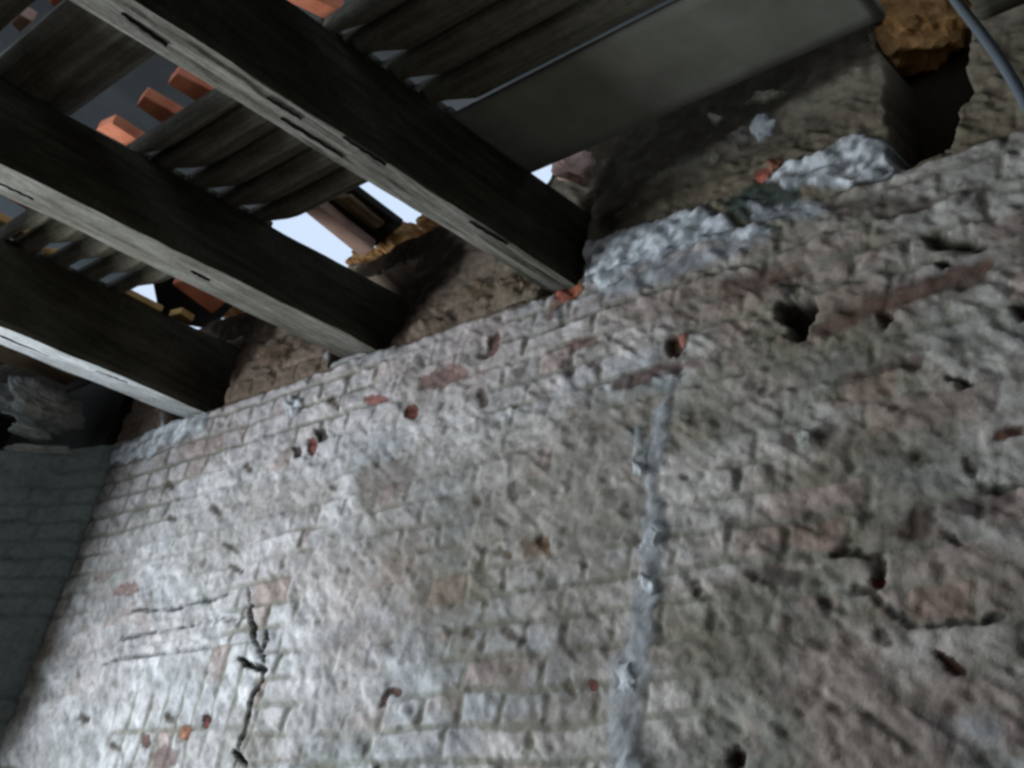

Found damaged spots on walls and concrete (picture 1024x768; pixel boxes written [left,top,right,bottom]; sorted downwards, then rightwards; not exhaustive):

crack [105,593,270,718]
crack [233,744,248,766]